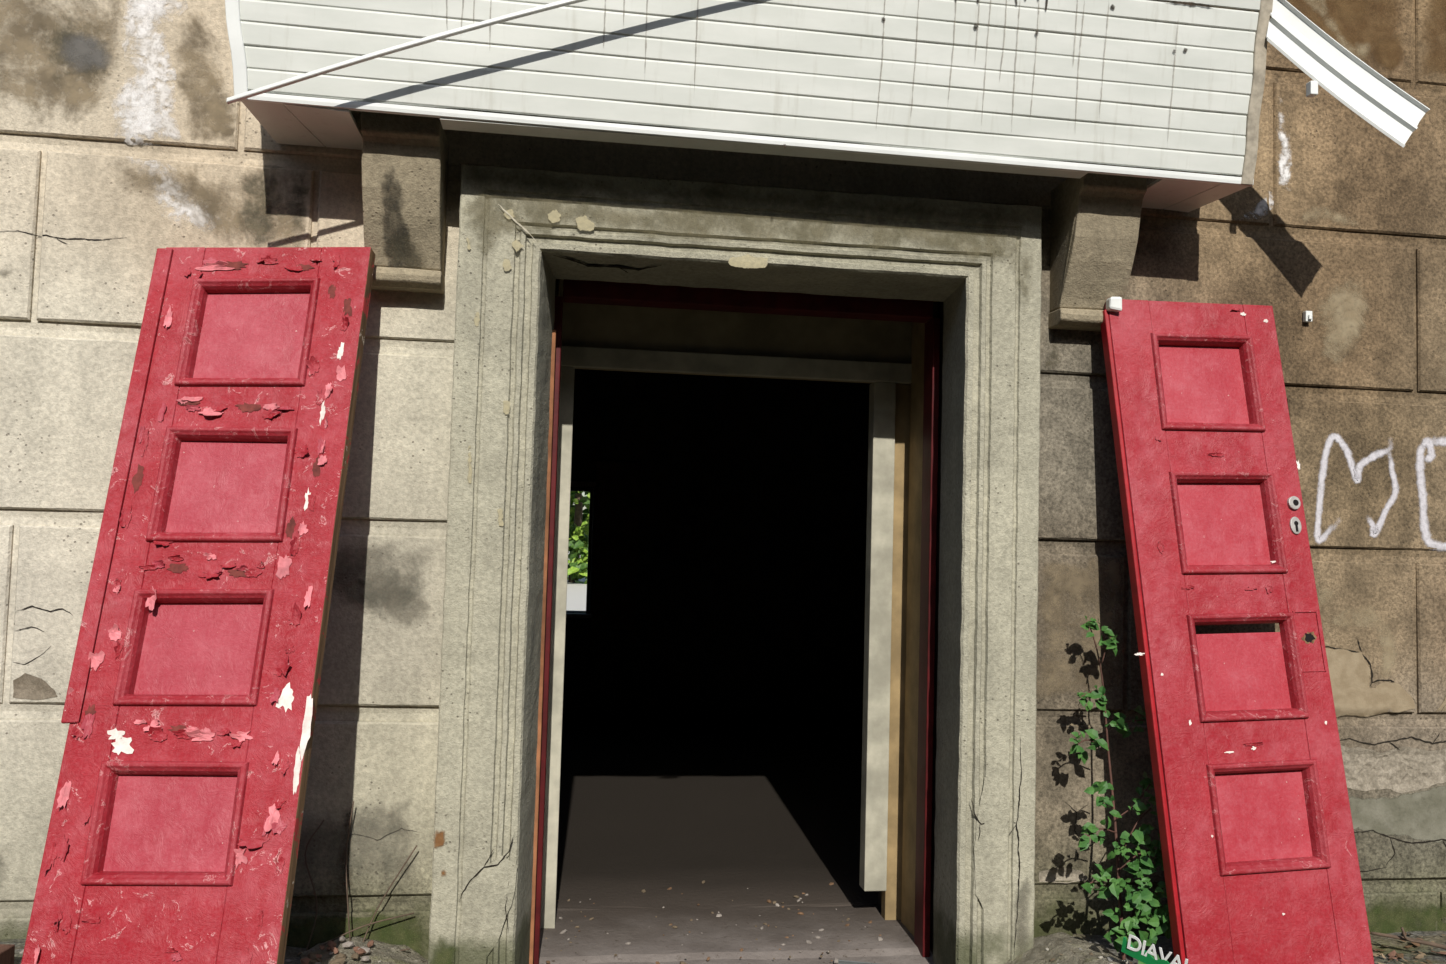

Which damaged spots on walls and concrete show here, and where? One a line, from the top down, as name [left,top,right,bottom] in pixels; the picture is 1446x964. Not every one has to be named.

water stain [0,0,234,145]
water stain [1279,115,1290,184]
water stain [132,160,306,242]
water stain [382,175,422,267]
crack [498,204,661,273]
water stain [1255,197,1274,215]
peeling [1302,632,1415,725]
flaking render [1341,745,1446,793]
crack [459,832,515,931]
crack [971,738,1022,956]